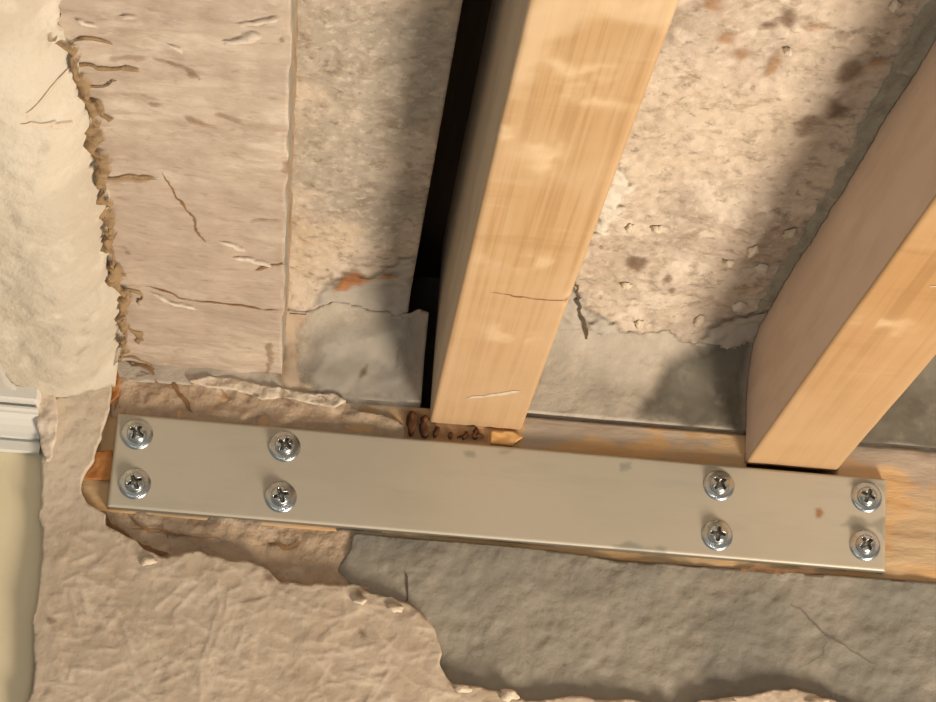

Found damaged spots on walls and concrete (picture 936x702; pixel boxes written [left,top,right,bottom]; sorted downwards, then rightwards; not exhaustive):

leakage [765,14,794,29]
leakage [839,63,859,82]
leakage [629,258,646,270]
crack [498,284,588,339]
leakage [642,342,749,430]
flaking render [140,557,157,566]
flaking render [387,604,404,613]
flaking render [454,685,473,693]
flaking render [499,689,520,702]